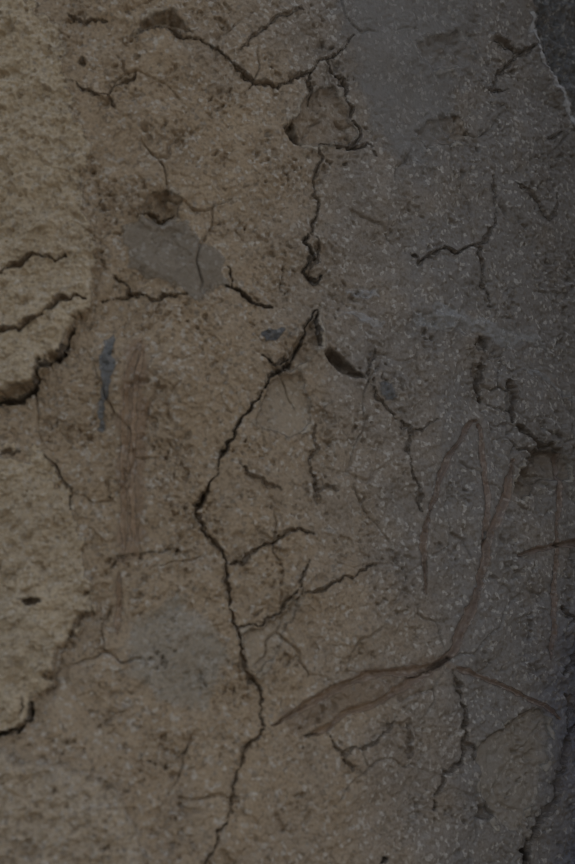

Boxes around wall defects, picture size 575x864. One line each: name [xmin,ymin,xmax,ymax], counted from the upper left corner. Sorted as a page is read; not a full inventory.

crack [68,14,108,26]
crack [74,73,136,107]
crack [137,4,377,286]
crack [0,251,67,274]
crack [0,274,188,333]
crack [225,270,273,309]
crack [0,327,75,406]
crack [365,349,438,512]
crack [192,309,373,864]
crack [0,701,35,736]
crack [305,720,414,771]
crack [432,669,476,811]